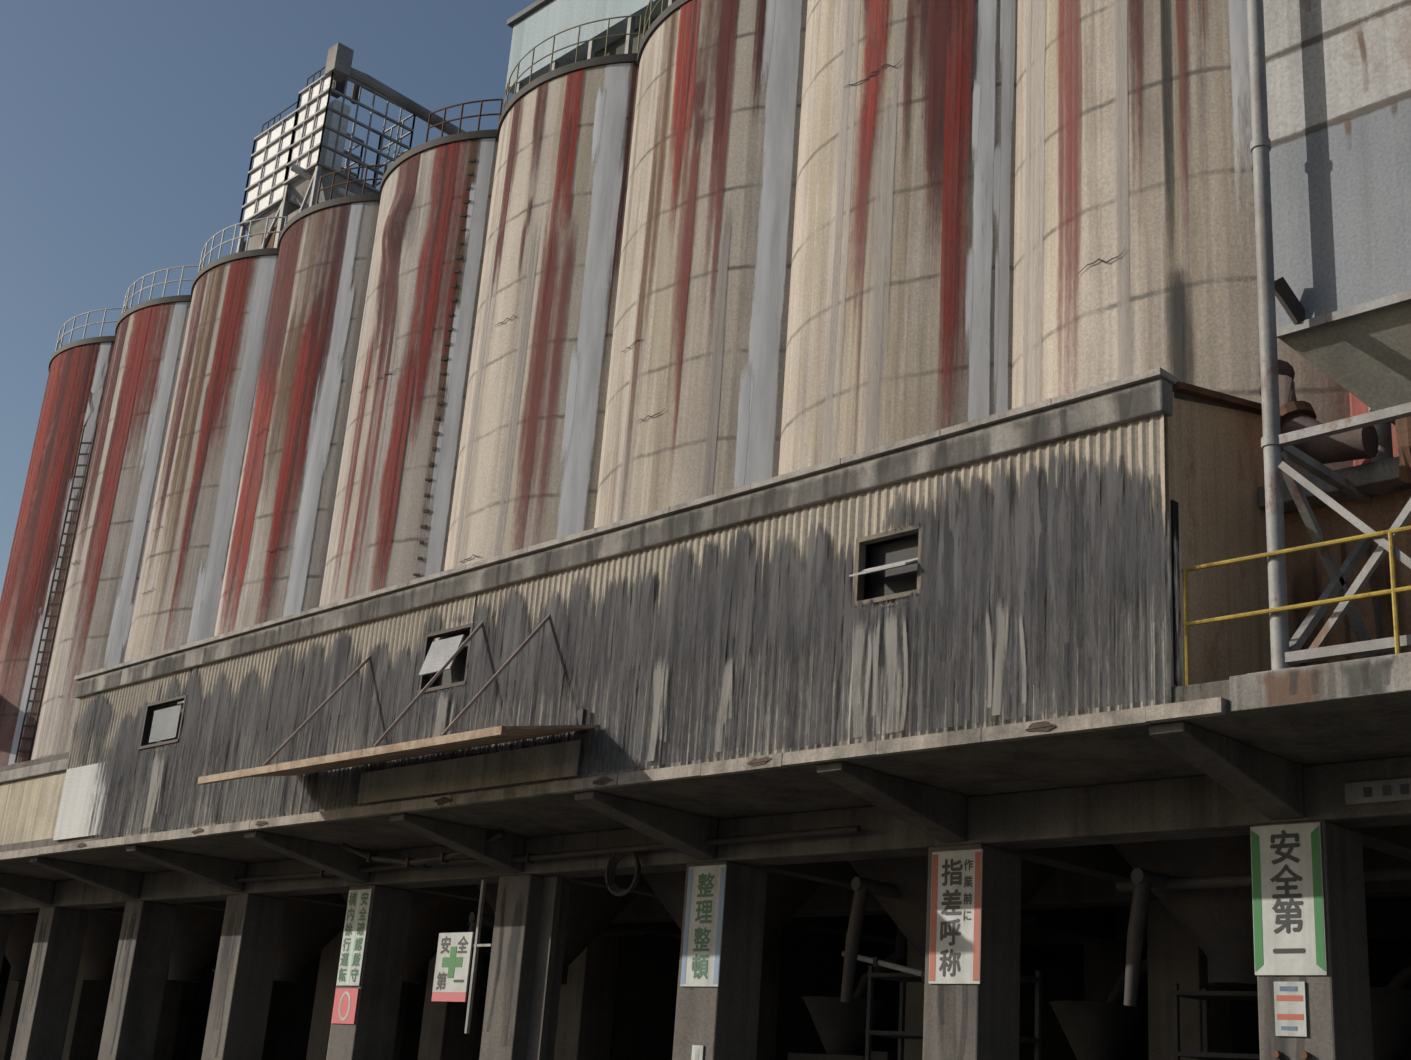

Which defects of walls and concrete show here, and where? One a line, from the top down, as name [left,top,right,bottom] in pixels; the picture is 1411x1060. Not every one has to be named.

corrosion [0,303,170,680]
corrosion [156,257,255,613]
corrosion [218,203,351,634]
corrosion [342,139,478,599]
leakage [454,240,503,568]
corrosion [492,83,547,284]
leakage [507,239,538,461]
corrosion [521,69,584,530]
leakage [53,445,1183,839]
corrosion [627,0,738,434]
leakage [865,97,897,450]
corrosion [857,0,975,428]